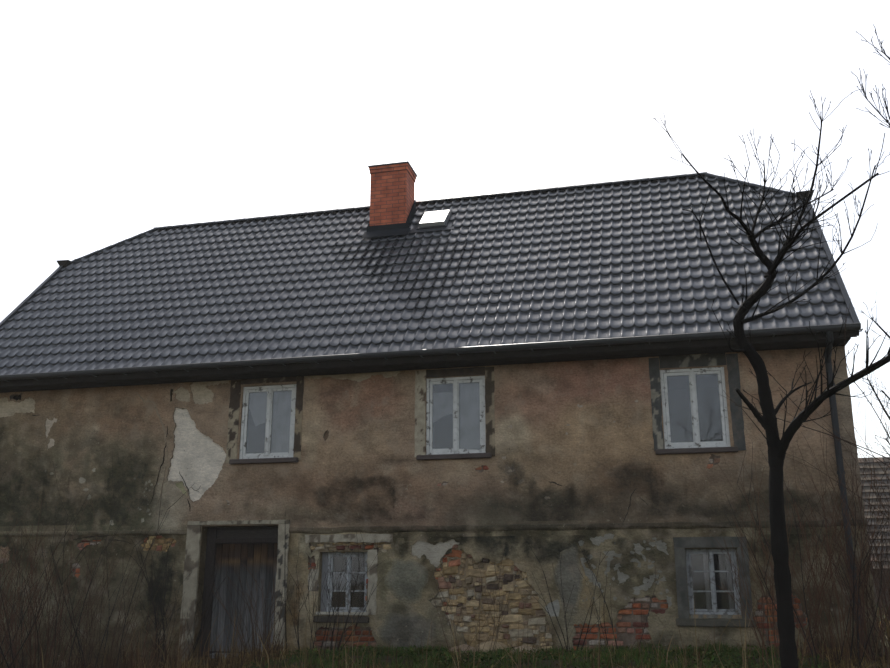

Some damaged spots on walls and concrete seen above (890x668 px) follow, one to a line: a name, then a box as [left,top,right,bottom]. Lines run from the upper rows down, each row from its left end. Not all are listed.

flaking render [0,393,35,418]
crack [151,426,200,507]
flaking render [137,380,229,523]
flaking render [411,539,560,651]
spalling [572,533,672,651]